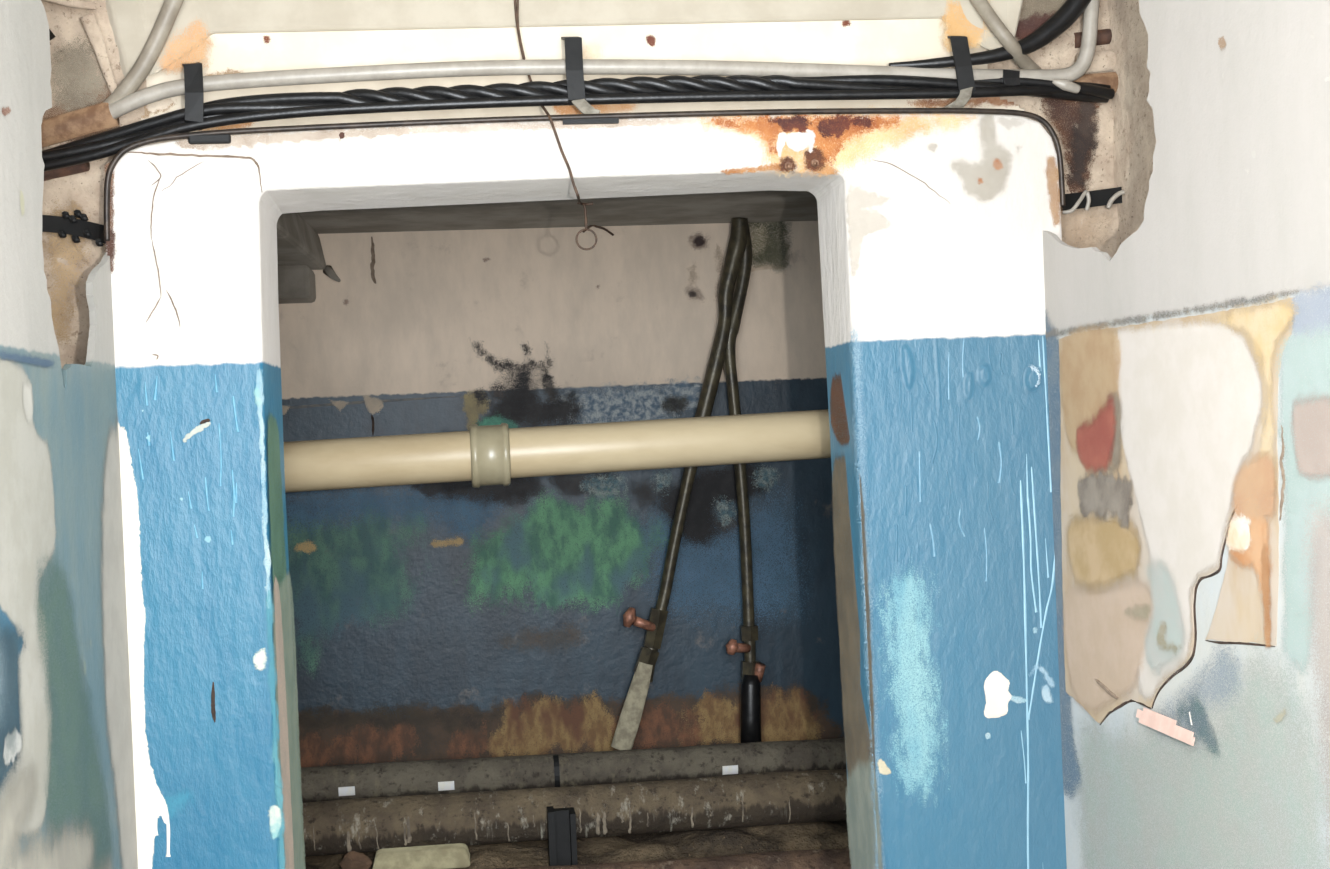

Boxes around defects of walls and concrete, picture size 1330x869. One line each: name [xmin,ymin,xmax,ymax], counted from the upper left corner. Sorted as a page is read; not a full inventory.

spalling [42,155,115,225]
spalling [42,0,125,120]
spalling [42,79,175,151]
crack [127,152,262,326]
corrosion [690,97,1020,179]
spalling [988,0,1110,74]
spalling [1000,96,1118,258]
spalling [42,232,106,369]
peeling [1059,294,1299,759]